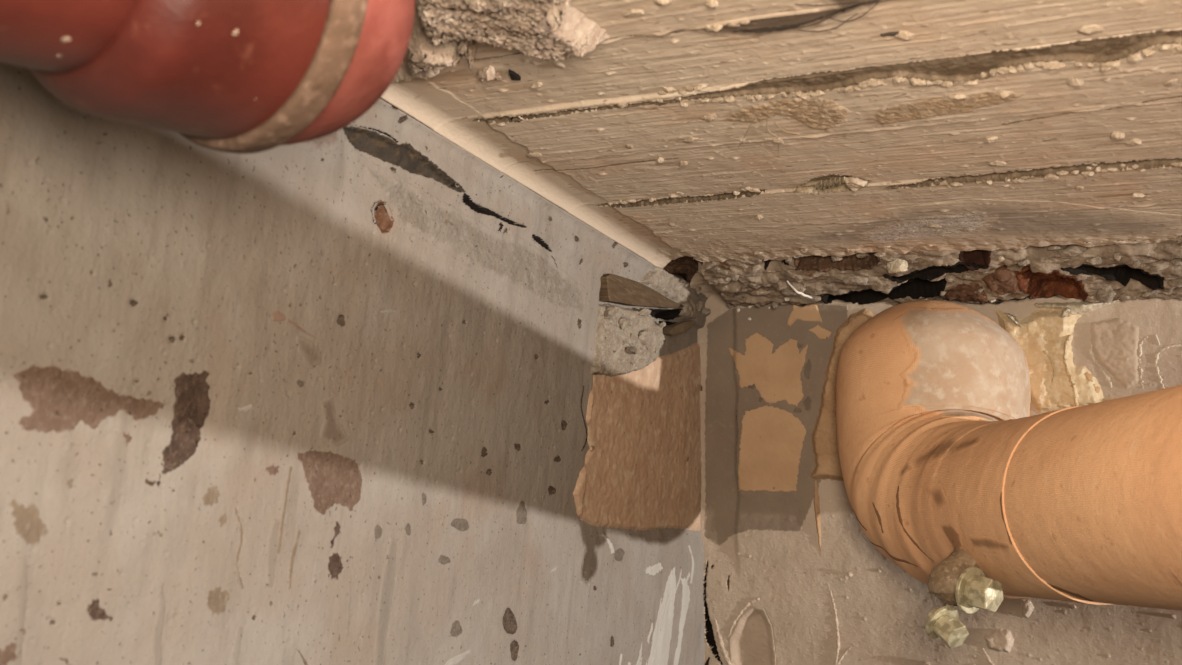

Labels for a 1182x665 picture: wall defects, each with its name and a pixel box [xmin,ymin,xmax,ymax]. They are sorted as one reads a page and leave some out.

crack [342,125,558,269]
damp [319,397,349,448]
peeling [728,304,831,492]
damp [265,466,301,590]
damp [373,537,397,665]